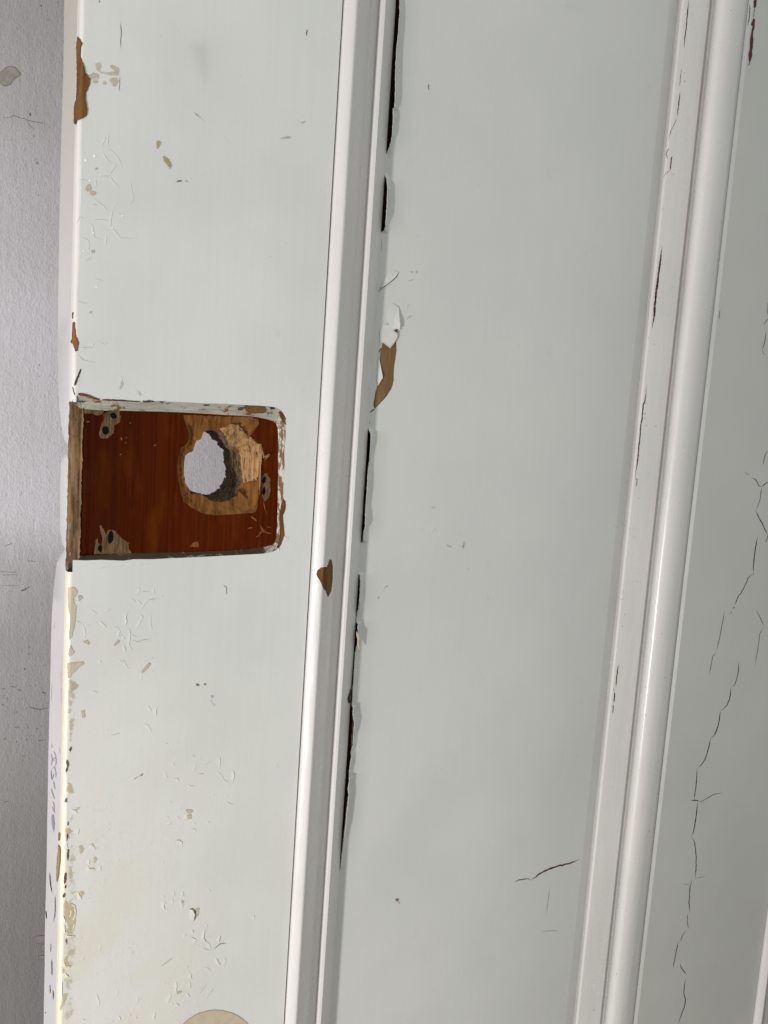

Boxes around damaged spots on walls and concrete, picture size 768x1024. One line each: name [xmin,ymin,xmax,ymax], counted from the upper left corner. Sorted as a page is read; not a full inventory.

peeling [73,36,90,125]
peeling [371,303,400,412]
peeling [316,560,333,596]
peeling [2,587,90,712]
crack [673,454,768,1021]
peeling [49,808,101,940]
crack [515,860,577,882]
peeling [34,935,72,1010]